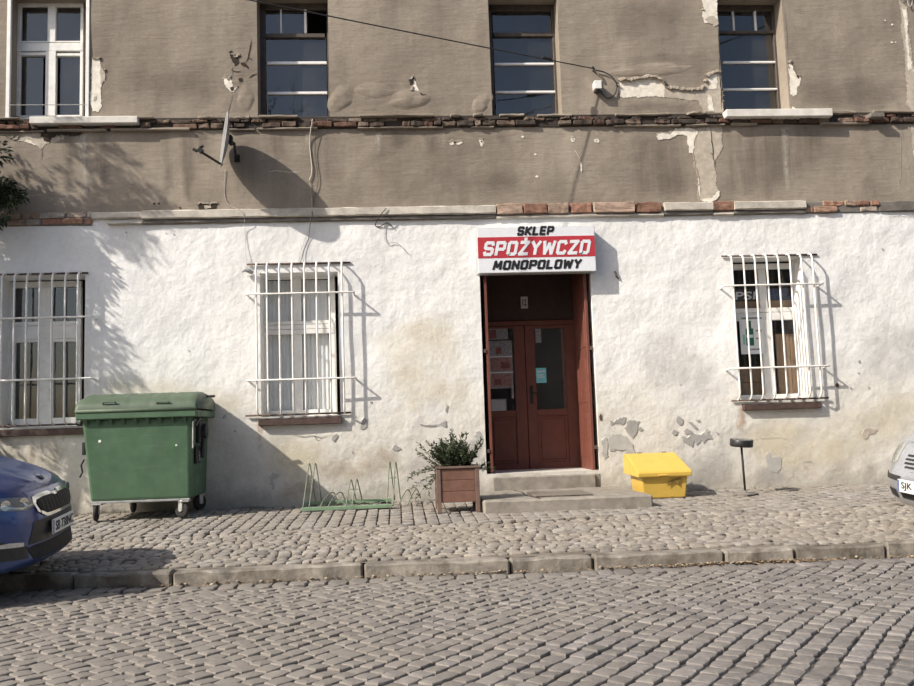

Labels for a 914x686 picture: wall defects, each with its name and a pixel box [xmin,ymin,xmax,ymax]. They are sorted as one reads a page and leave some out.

flaking render [702,0,719,26]
flaking render [229,50,249,69]
flaking render [89,57,106,112]
flaking render [223,76,242,92]
flaking render [615,69,725,113]
flaking render [788,60,801,109]
flaking render [7,132,83,149]
flaking render [656,126,734,212]
peeling [599,414,643,459]
peeling [672,416,719,447]